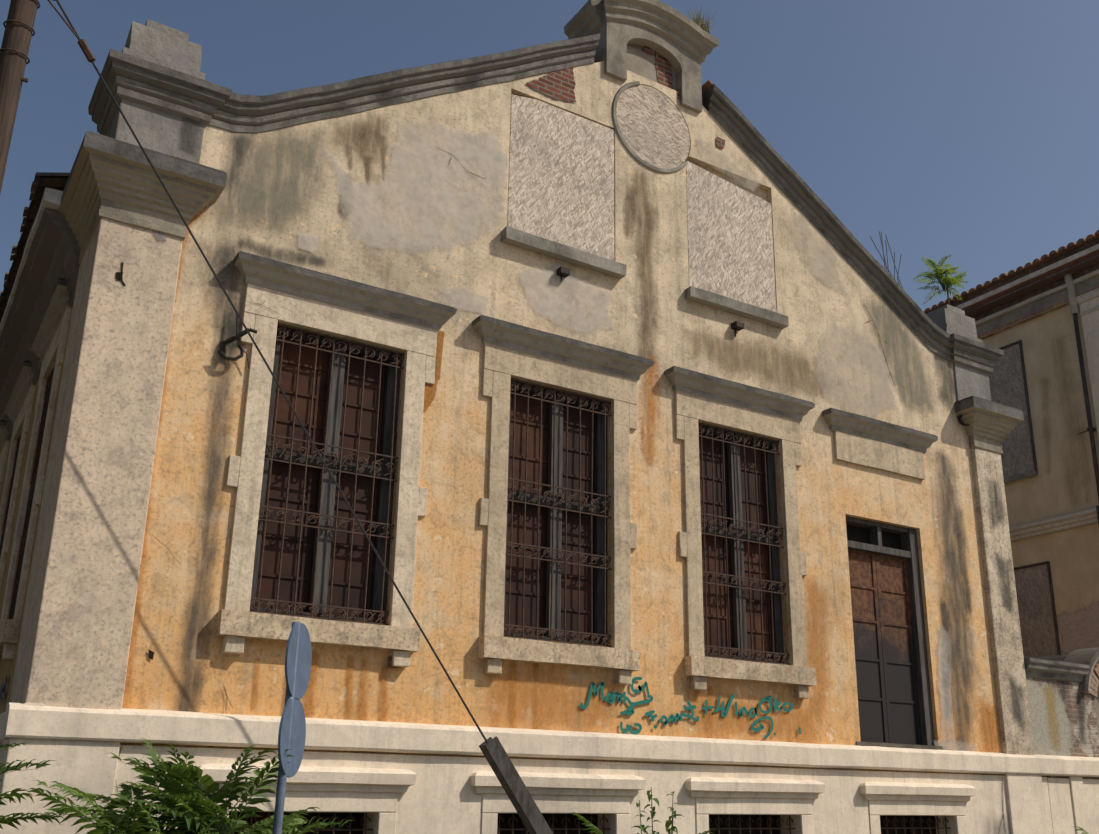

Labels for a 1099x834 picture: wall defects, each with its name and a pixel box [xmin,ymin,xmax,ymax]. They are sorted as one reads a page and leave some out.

spalling [526,67,577,102]
damp [247,242,323,264]
damp [626,175,653,360]
damp [213,246,240,366]
damp [992,483,1003,524]
damp [179,441,222,712]
damp [941,456,971,751]
damp [997,556,1012,610]
corrosion [305,654,317,718]
corrosion [347,659,366,720]
damp [1012,681,1022,726]
peeling [1026,677,1075,756]